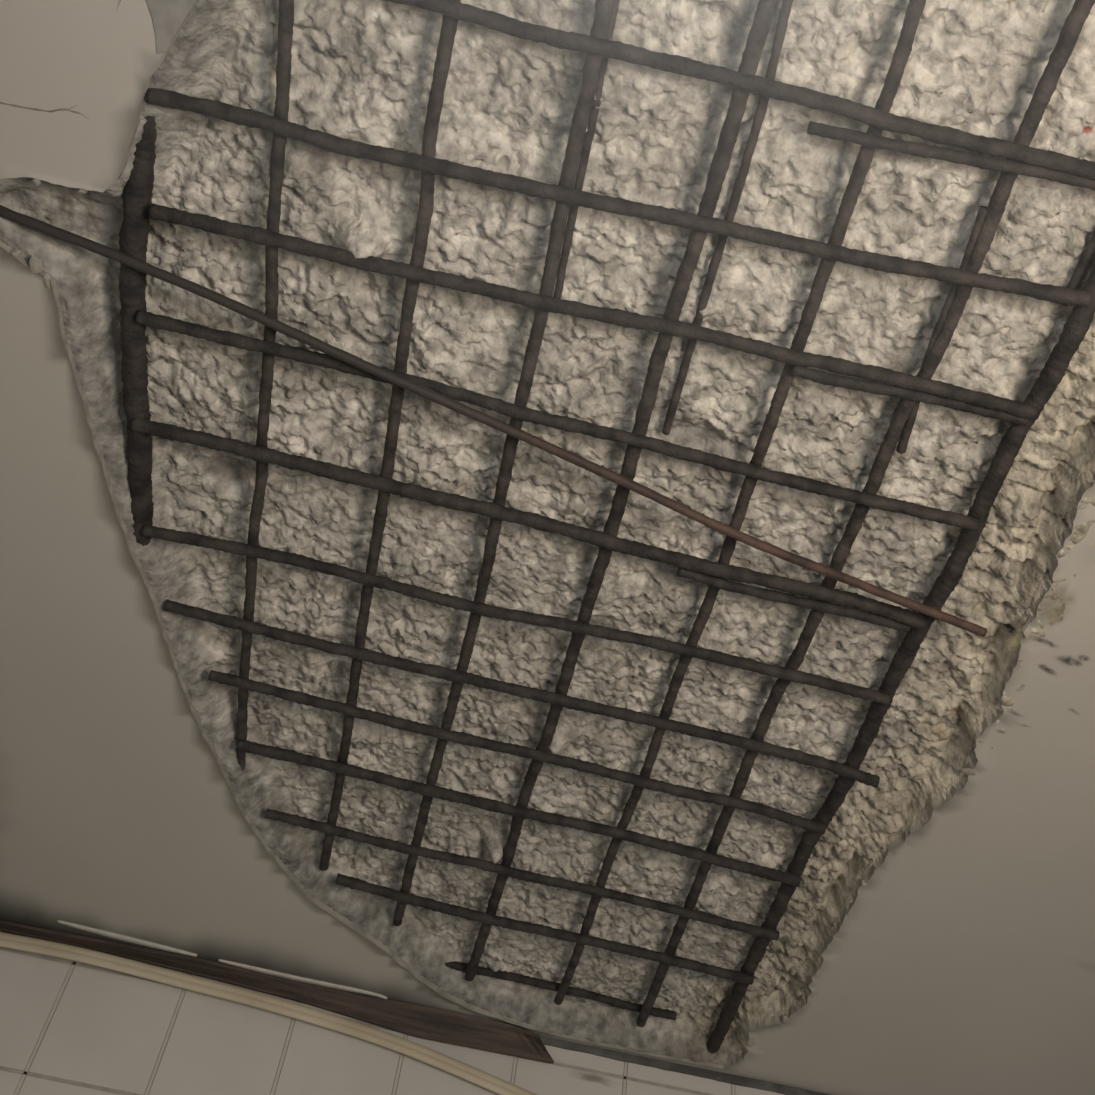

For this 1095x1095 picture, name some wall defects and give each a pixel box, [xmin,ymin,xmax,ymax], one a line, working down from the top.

crack [0,102,88,119]
spalling [0,0,279,251]
spalling [288,0,443,155]
spalling [435,20,587,185]
spalling [573,58,733,215]
spalling [612,0,759,71]
spalling [755,0,909,108]
spalling [713,93,1006,269]
spalling [889,0,1075,142]
spalling [978,175,1095,290]
spalling [145,138,659,532]
spalling [0,204,1095,1066]